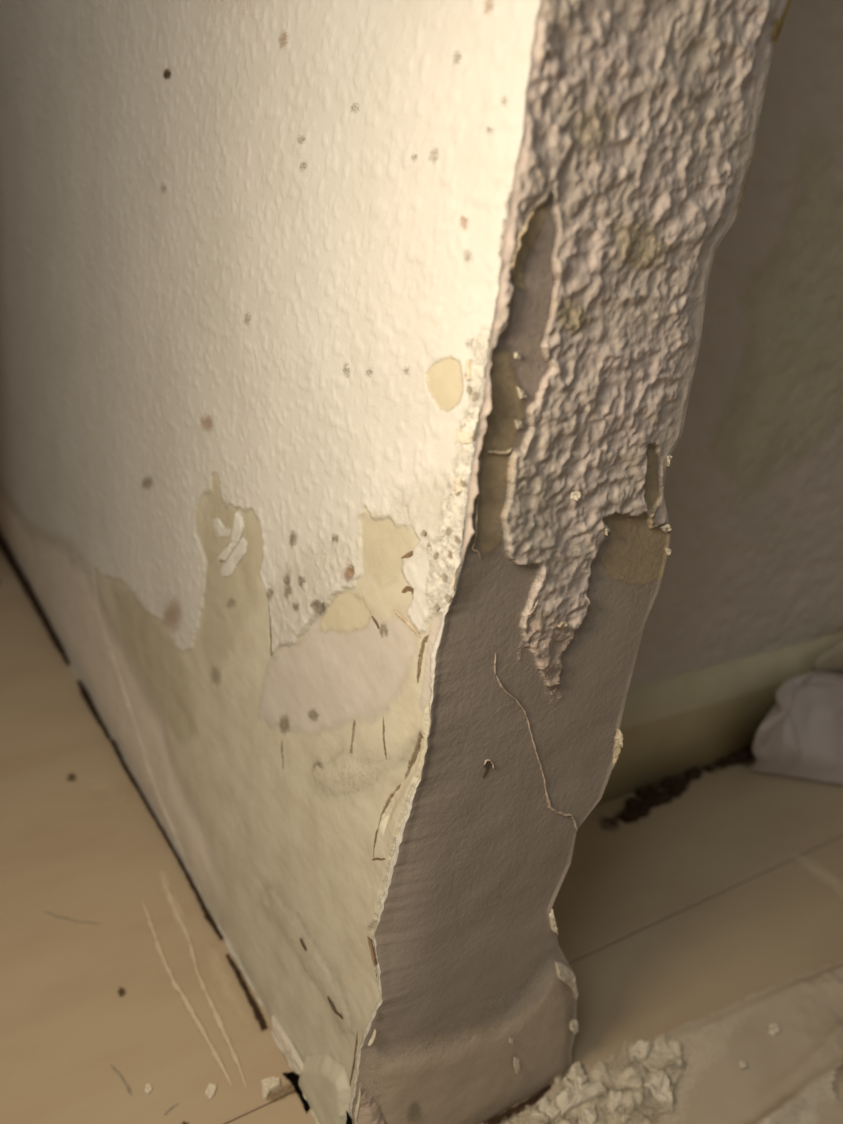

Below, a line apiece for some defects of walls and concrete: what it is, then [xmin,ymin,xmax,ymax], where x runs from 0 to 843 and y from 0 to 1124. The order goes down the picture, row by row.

peeling [92,185,672,1124]
crack [494,654,578,831]